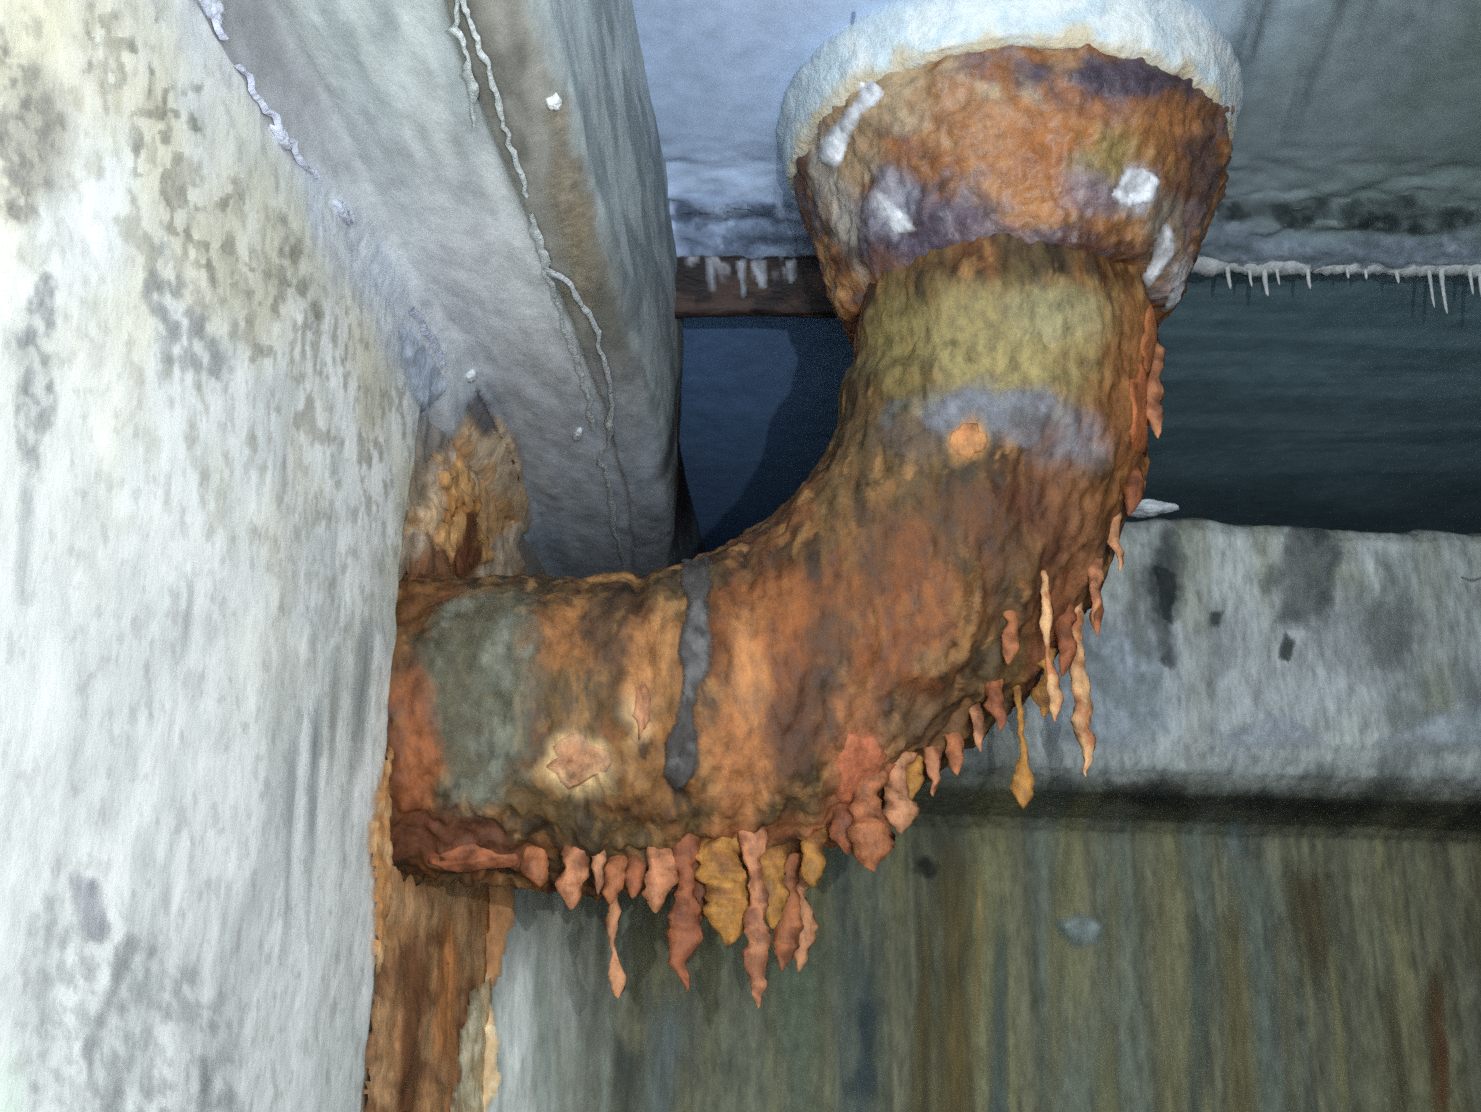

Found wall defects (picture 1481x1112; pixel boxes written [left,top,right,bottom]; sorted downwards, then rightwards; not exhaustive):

mould [0,96,64,220]
mould [136,87,170,173]
mould [145,180,236,379]
mould [281,241,324,318]
rust [675,255,837,318]
mould [17,273,55,458]
damp [310,669,339,847]
damp [355,630,372,746]
rust [364,304,1166,1112]
damp [74,877,105,937]
damp [104,942,137,1013]
damp [84,1036,97,1063]